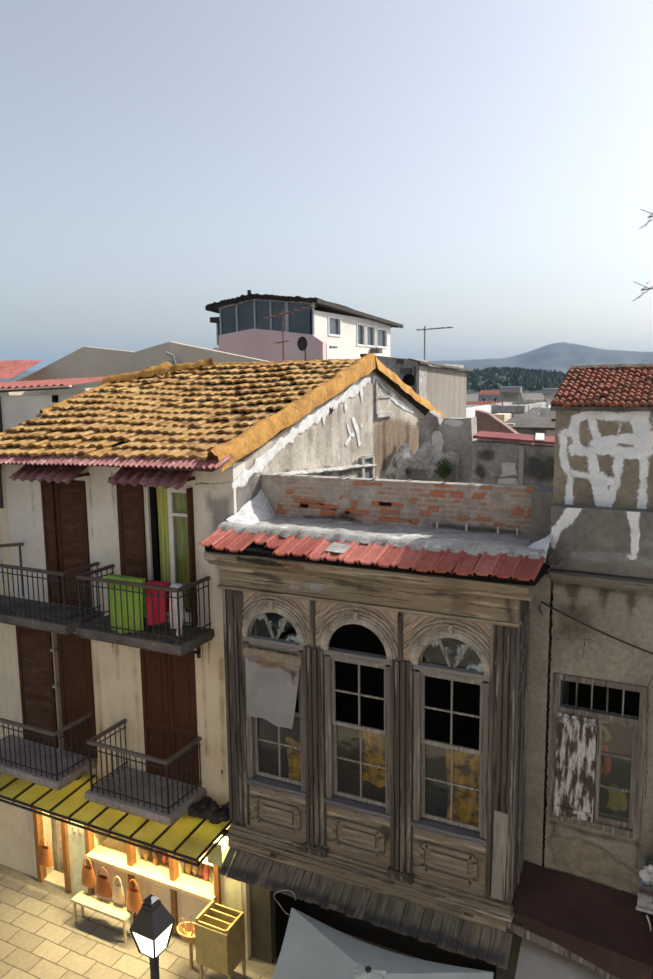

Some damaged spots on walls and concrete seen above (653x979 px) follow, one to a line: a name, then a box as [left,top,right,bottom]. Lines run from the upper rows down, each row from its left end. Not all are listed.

flaking render [276,461,537,526]